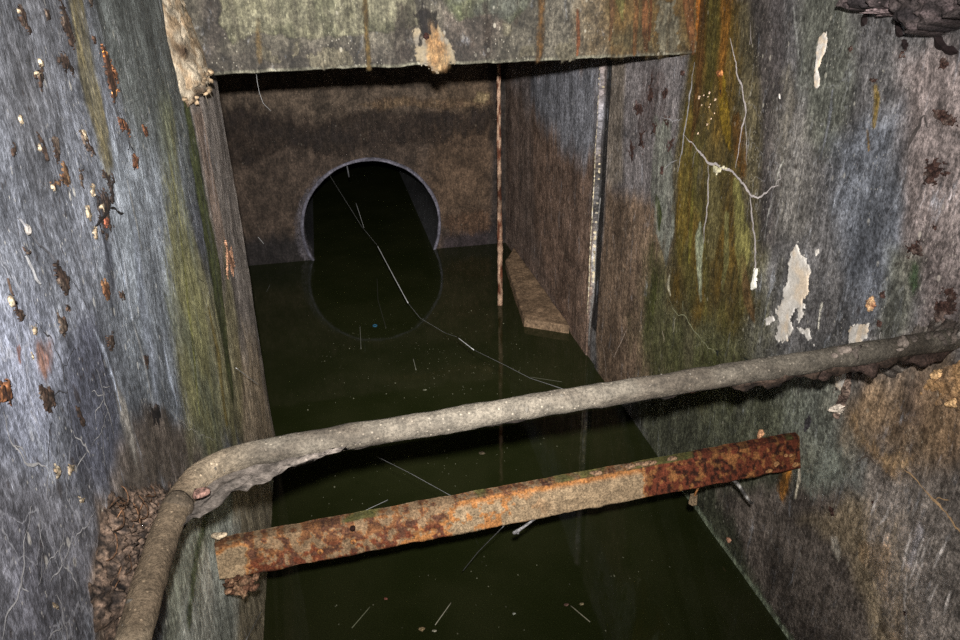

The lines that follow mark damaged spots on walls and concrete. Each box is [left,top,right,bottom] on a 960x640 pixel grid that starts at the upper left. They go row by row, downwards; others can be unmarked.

spalling [412,2,457,74]
leakage [633,74,668,115]
leakage [652,0,680,55]
peeling [814,32,828,88]
spalling [836,0,960,70]
leakage [628,115,675,262]
crack [661,25,781,290]
peeling [764,244,819,346]
corrosion [625,456,678,470]
corrosion [765,454,801,500]